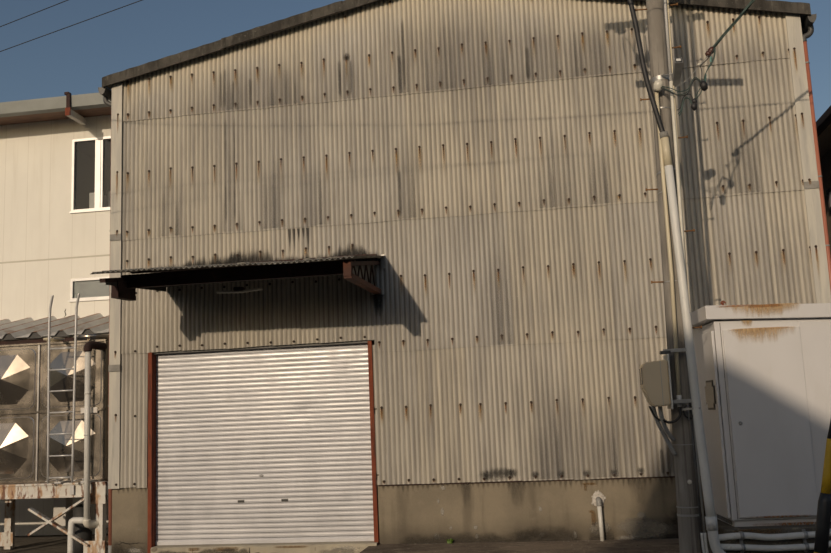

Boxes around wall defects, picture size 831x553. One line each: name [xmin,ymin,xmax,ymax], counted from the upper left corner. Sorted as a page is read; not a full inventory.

leakage [288,228,309,245]
leakage [184,253,276,271]
leakage [333,248,380,261]
rust [725,303,794,337]
leakage [406,530,577,544]